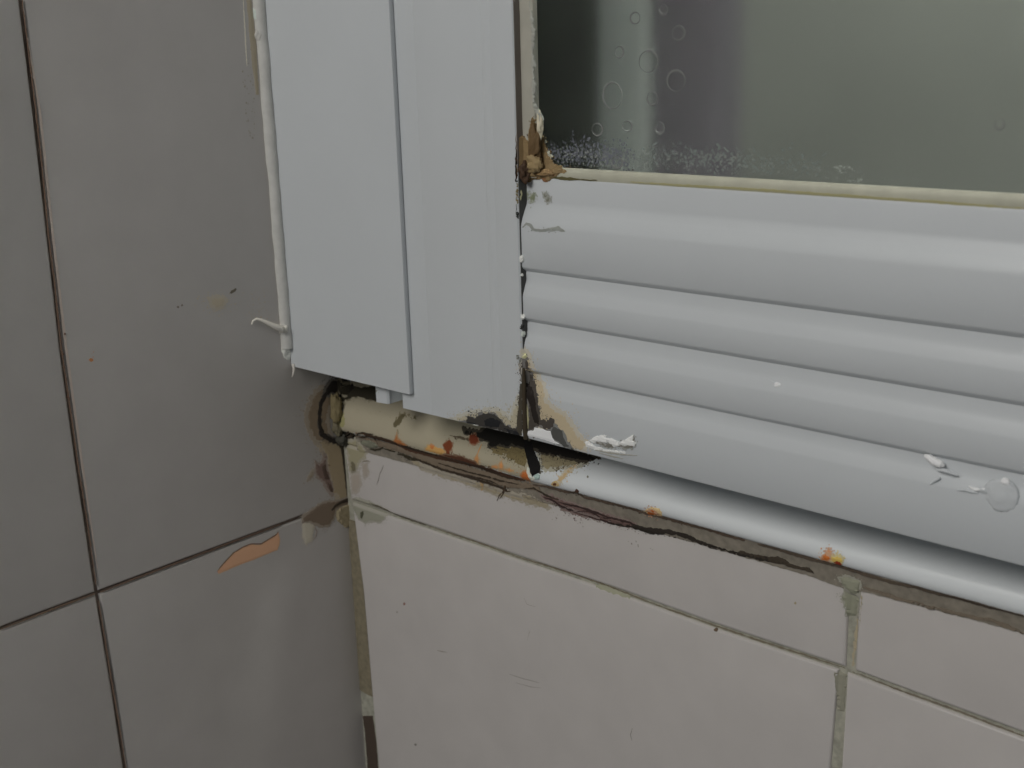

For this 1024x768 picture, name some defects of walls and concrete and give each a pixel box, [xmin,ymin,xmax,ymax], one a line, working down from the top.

leakage [443,342,601,478]
corrosion [387,432,534,482]
leakage [299,375,638,532]
peeling [585,434,636,454]
peeling [217,533,280,574]
corrosion [817,547,847,565]
crack [332,434,1024,736]